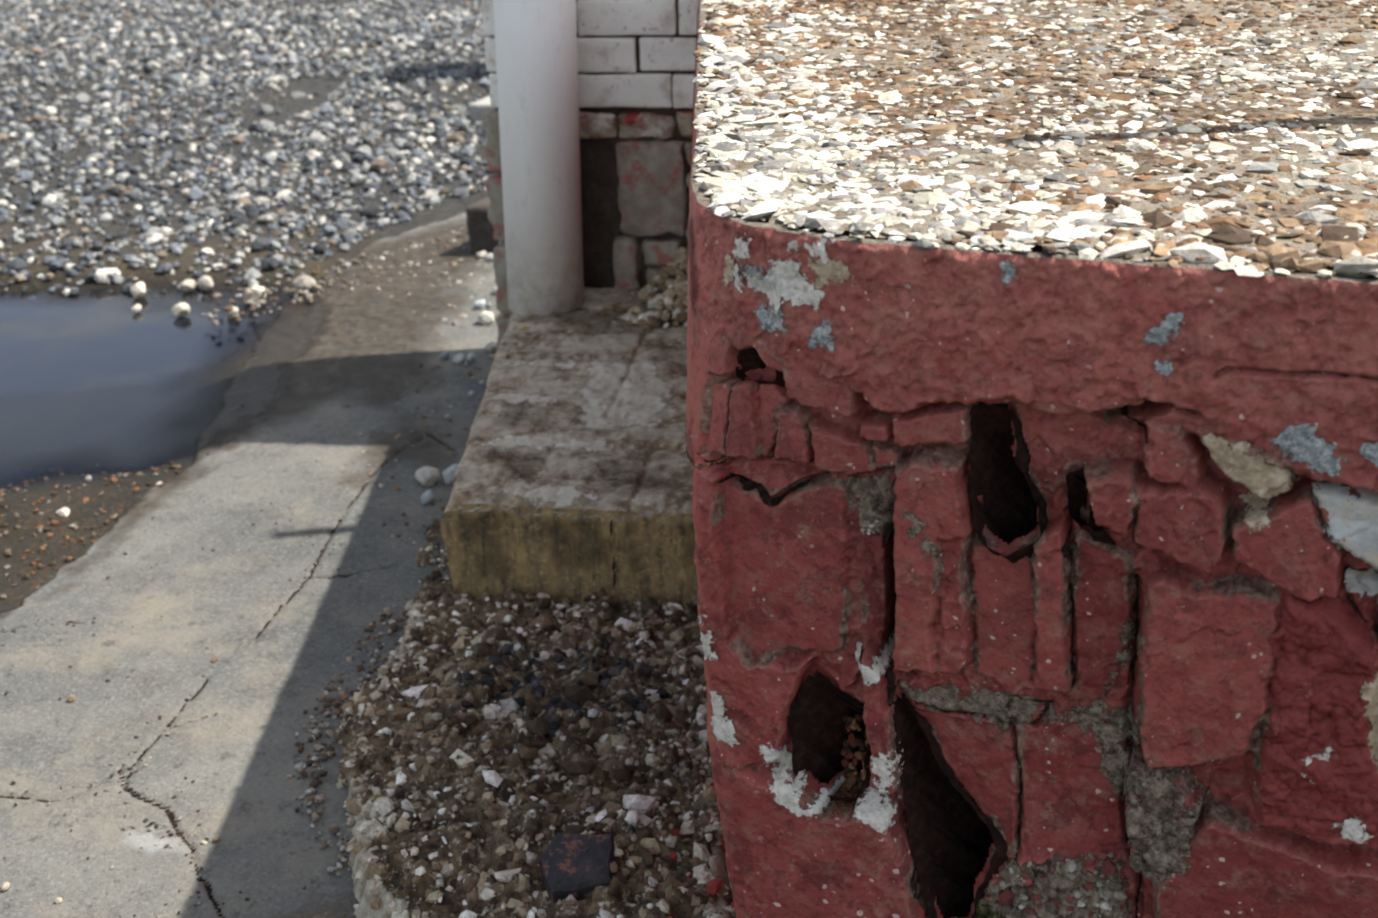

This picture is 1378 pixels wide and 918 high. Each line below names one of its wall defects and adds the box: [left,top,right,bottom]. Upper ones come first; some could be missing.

peeling [723,237,853,352]
spalling [736,347,785,387]
spalling [845,467,938,561]
spalling [968,404,1049,563]
spalling [1066,471,1117,545]
spalling [1200,423,1378,603]
spalling [759,618,1210,918]
peeling [1300,747,1335,784]
spalling [1360,673,1378,774]
peeling [1333,816,1374,844]
crack [911,866,938,918]